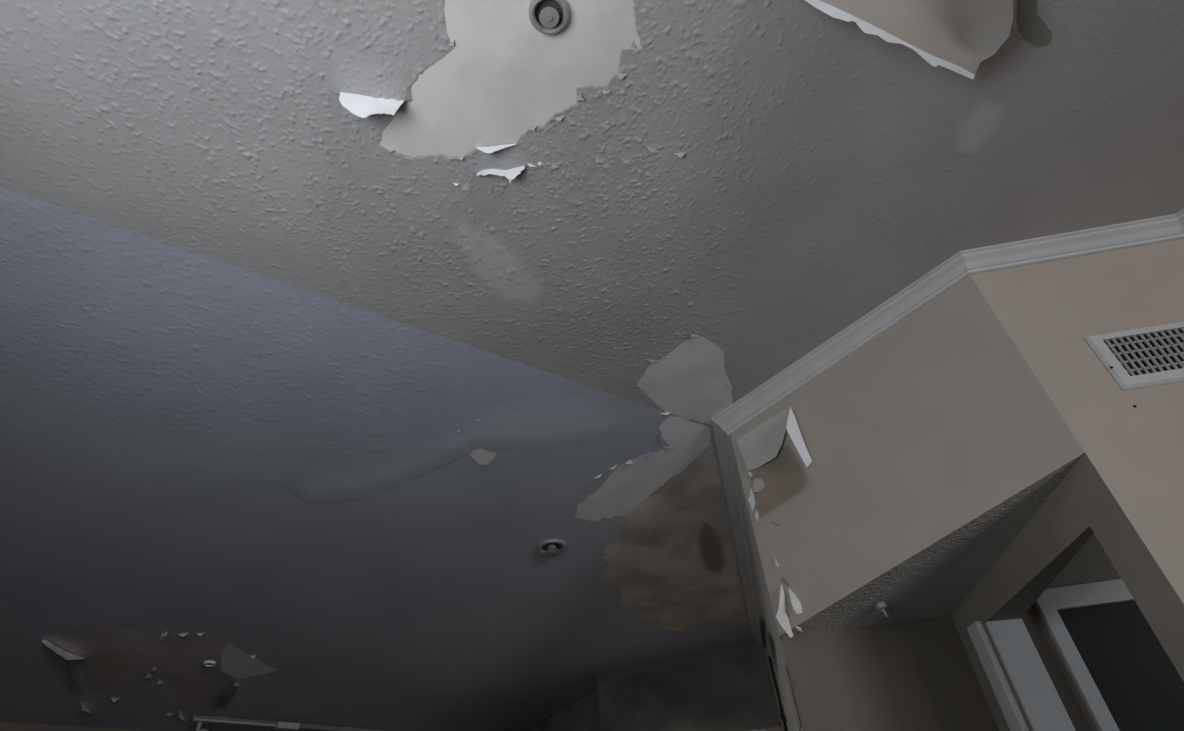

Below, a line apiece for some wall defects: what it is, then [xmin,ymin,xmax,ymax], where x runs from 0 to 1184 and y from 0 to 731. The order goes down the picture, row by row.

peeling [380,0,642,161]
peeling [1018,0,1052,47]
peeling [575,333,733,522]
peeling [736,407,812,521]
damp [598,445,788,731]
peeling [42,623,278,722]